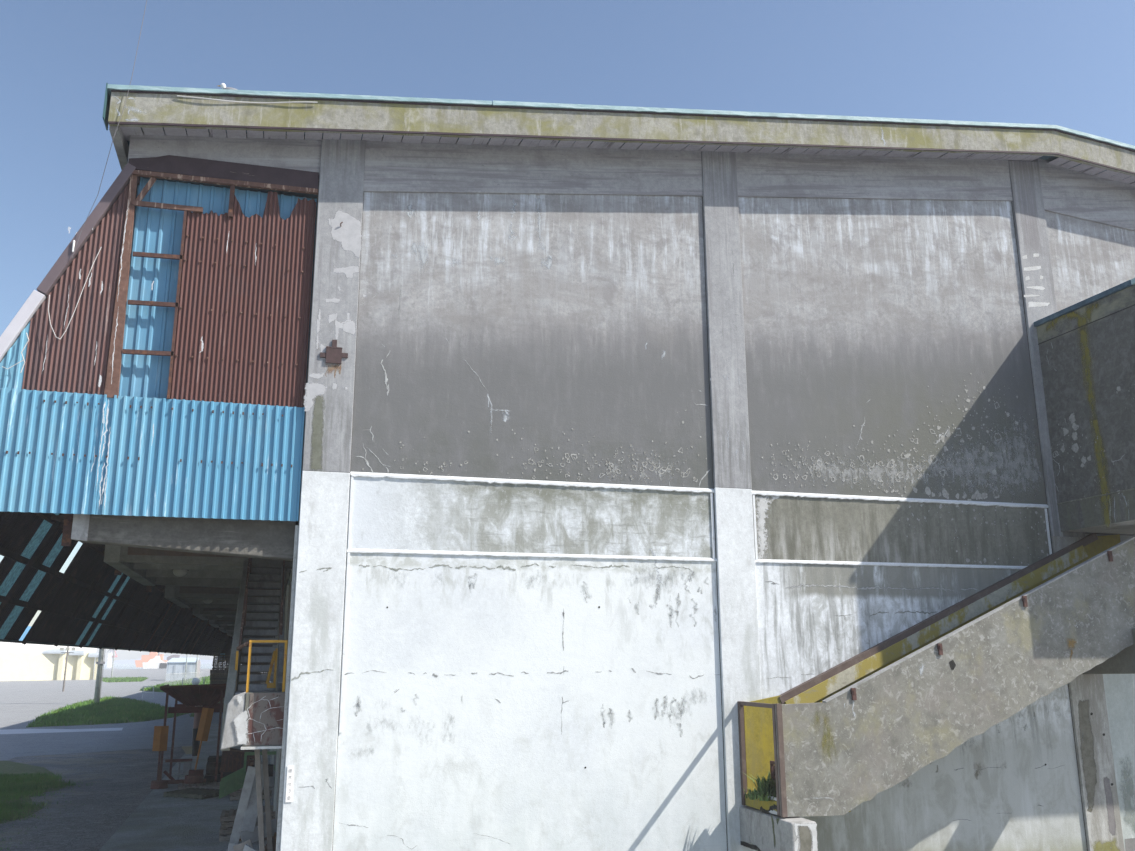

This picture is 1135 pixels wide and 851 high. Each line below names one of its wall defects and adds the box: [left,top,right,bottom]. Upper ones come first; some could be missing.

peeling [316,210,362,352]
leakage [798,420,1041,503]
crack [359,563,690,571]